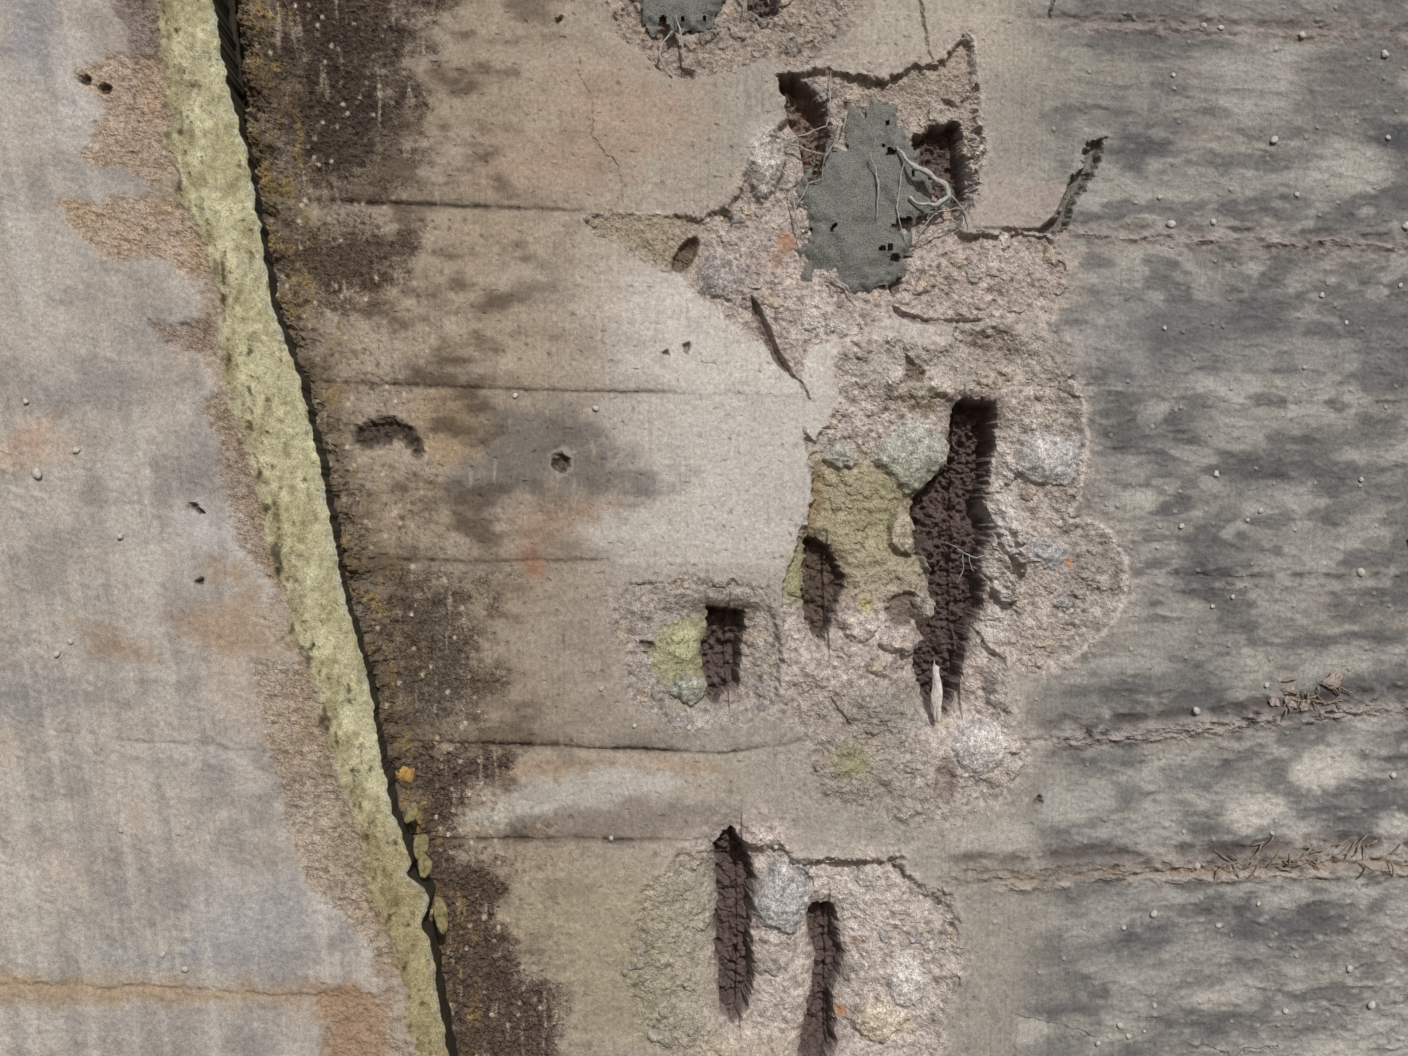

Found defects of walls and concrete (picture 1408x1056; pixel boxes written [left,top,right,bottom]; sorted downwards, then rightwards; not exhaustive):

leakage [235,0,463,325]
leakage [431,391,701,549]
spalling [581,0,1132,828]
leakage [351,555,825,1056]
spalling [621,823,969,1056]